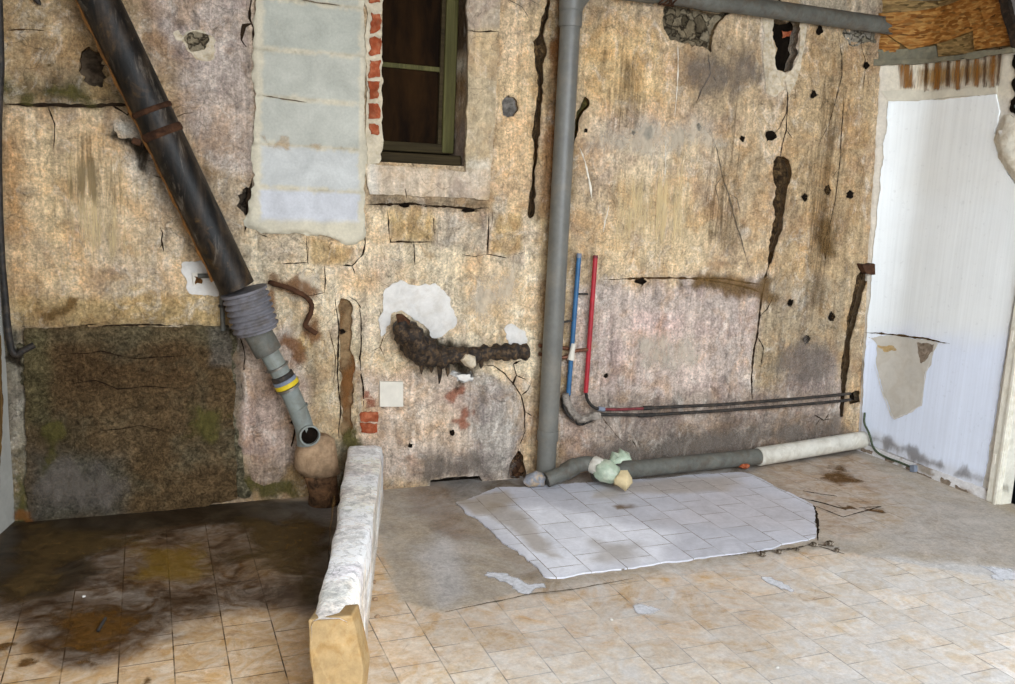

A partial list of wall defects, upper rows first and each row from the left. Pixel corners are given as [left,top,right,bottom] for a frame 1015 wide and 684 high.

spalling [663,6,726,50]
spalling [80,48,118,91]
crack [7,103,129,147]
corrosion [268,275,316,307]
crack [604,130,772,398]
peeling [865,332,950,420]
water stain [2,476,143,600]
water stain [232,502,334,599]
water stain [53,609,139,664]